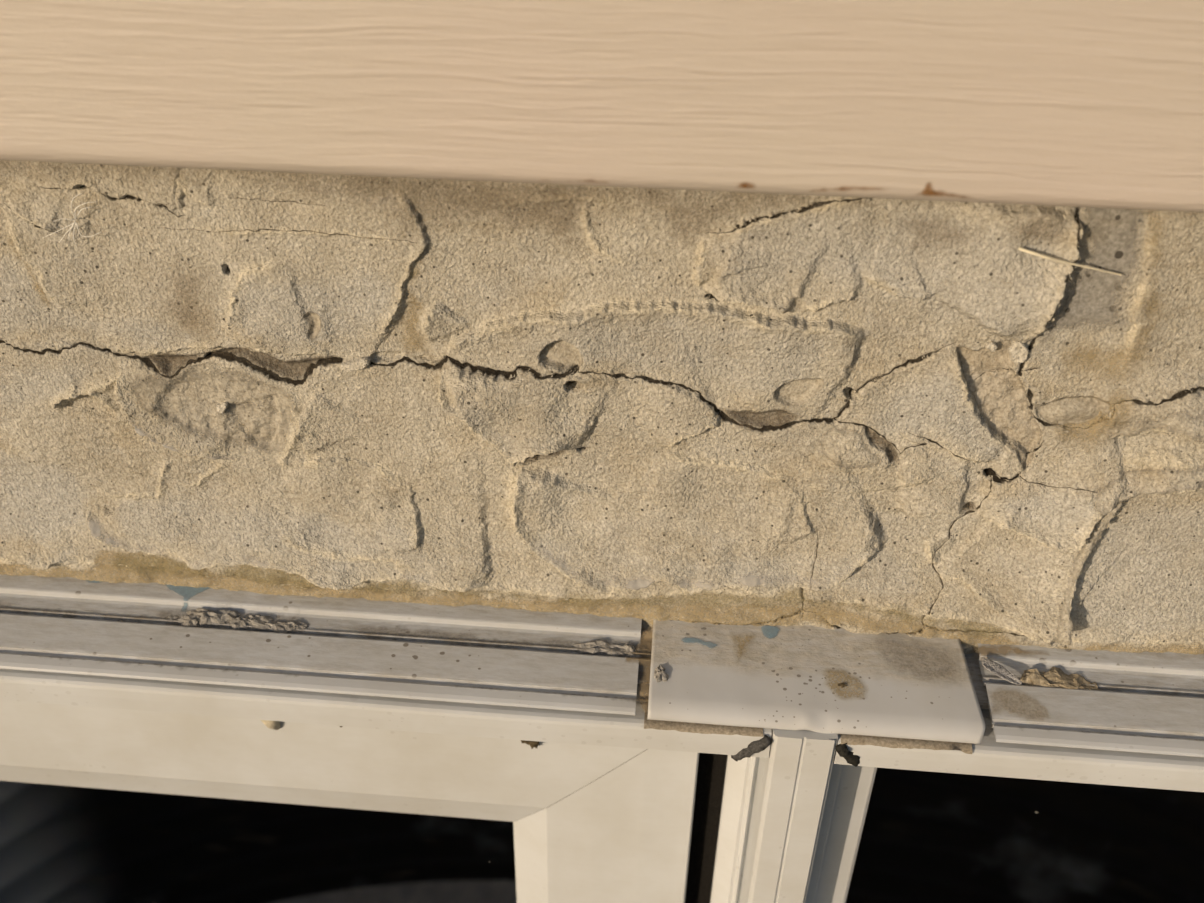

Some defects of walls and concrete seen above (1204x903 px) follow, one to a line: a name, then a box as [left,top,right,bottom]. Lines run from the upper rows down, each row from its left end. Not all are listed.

crack [42,185,415,243]
crack [704,198,872,234]
spalling [134,371,291,452]
crack [0,207,1204,636]
spalling [774,379,823,406]
spalling [957,340,1111,468]